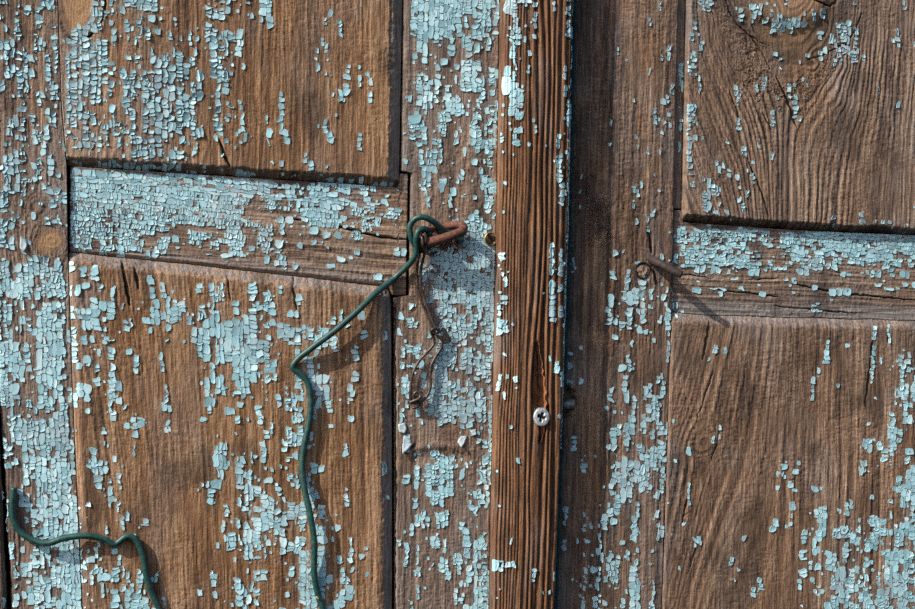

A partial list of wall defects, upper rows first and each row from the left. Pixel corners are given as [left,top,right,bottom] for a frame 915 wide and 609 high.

peeling [384,0,538,609]
peeling [543,0,596,473]
peeling [562,261,684,609]
peeling [632,181,655,232]
crack [726,0,796,126]
peeling [653,21,915,297]
peeling [769,461,801,532]
peeling [735,0,866,66]
peeling [811,288,851,312]
peeling [797,324,915,609]